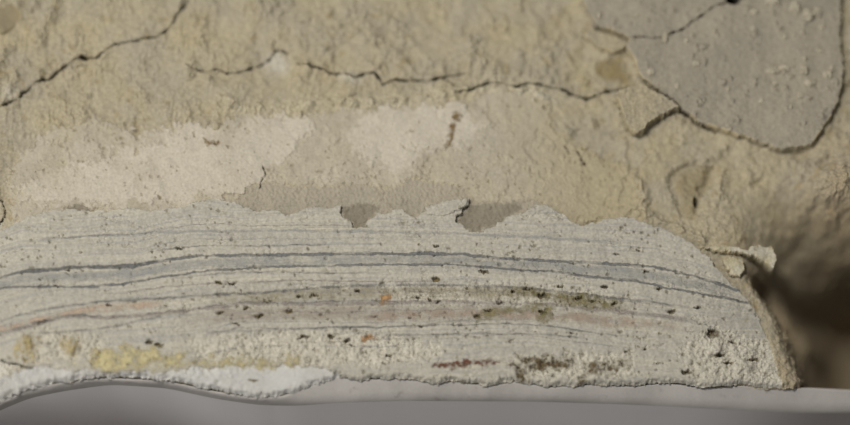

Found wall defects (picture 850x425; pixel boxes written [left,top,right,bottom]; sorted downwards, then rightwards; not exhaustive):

crack [634,2,727,39]
crack [2,0,187,106]
crack [185,41,618,101]
crack [679,107,716,134]
peeling [424,198,468,217]
spalling [701,245,777,283]